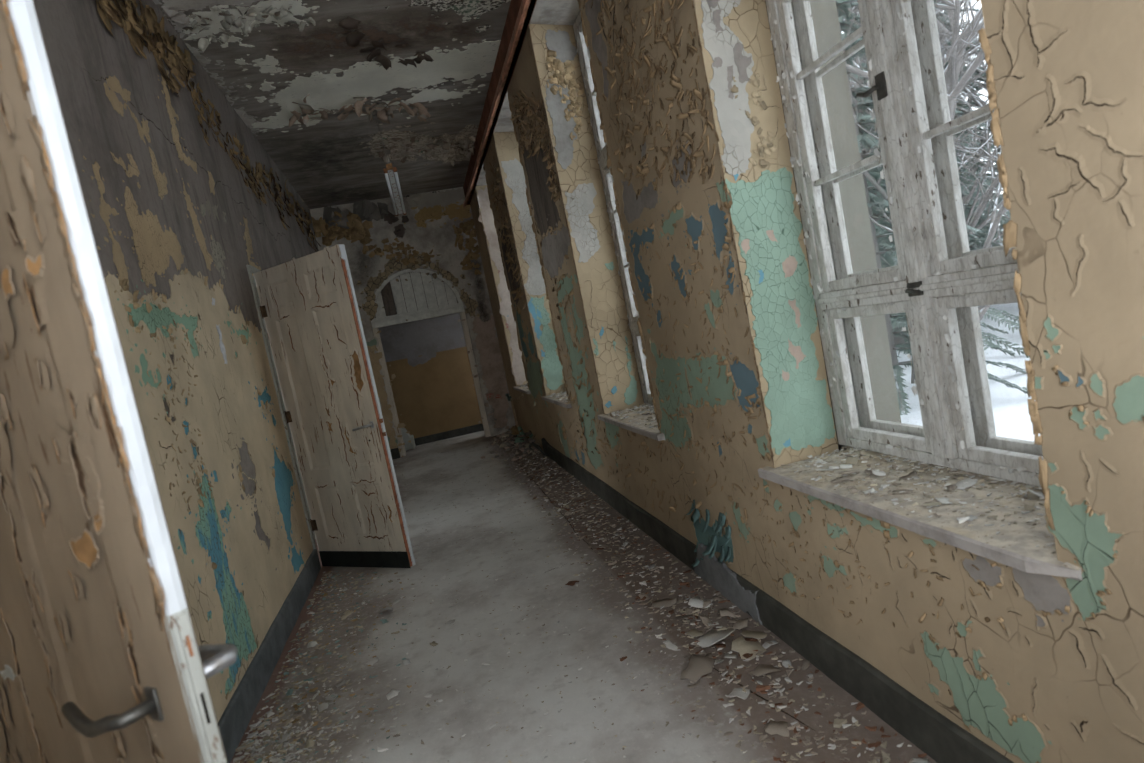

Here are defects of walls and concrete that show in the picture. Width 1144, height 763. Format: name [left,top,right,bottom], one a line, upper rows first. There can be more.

peeling [0,0,29,100]
peeling [0,116,165,632]
spalling [33,0,434,704]
spalling [452,0,801,472]
spalling [782,156,826,278]
peeling [918,28,1144,763]
crack [985,0,1144,296]
peeling [686,478,900,625]
crack [835,532,1034,647]
crack [1030,622,1144,747]